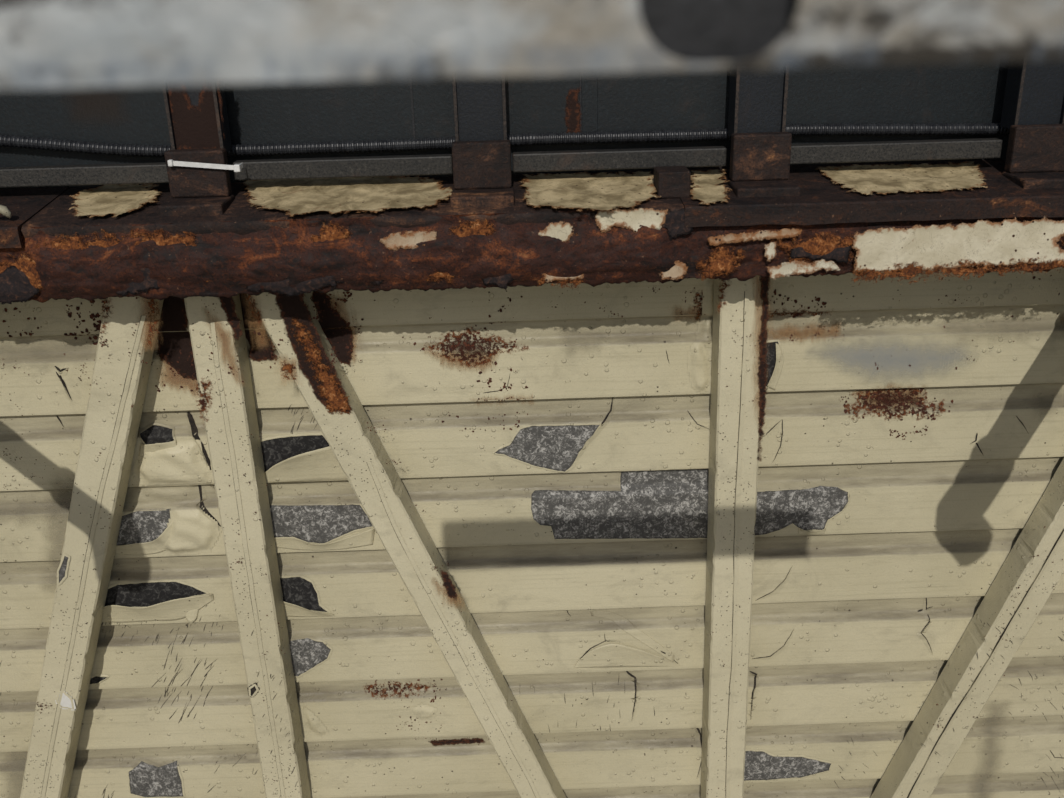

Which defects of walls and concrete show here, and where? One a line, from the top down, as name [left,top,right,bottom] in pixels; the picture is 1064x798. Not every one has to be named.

rust [850,258,1064,287]
rust [128,291,364,422]
rust [402,291,528,432]
rust [841,387,953,440]
peeling [260,433,348,483]
peeling [492,423,602,473]
crack [970,433,984,456]
peeling [529,468,709,541]
peeling [754,482,850,537]
crack [907,529,1064,798]
rust [364,678,485,746]
peeling [744,749,833,782]